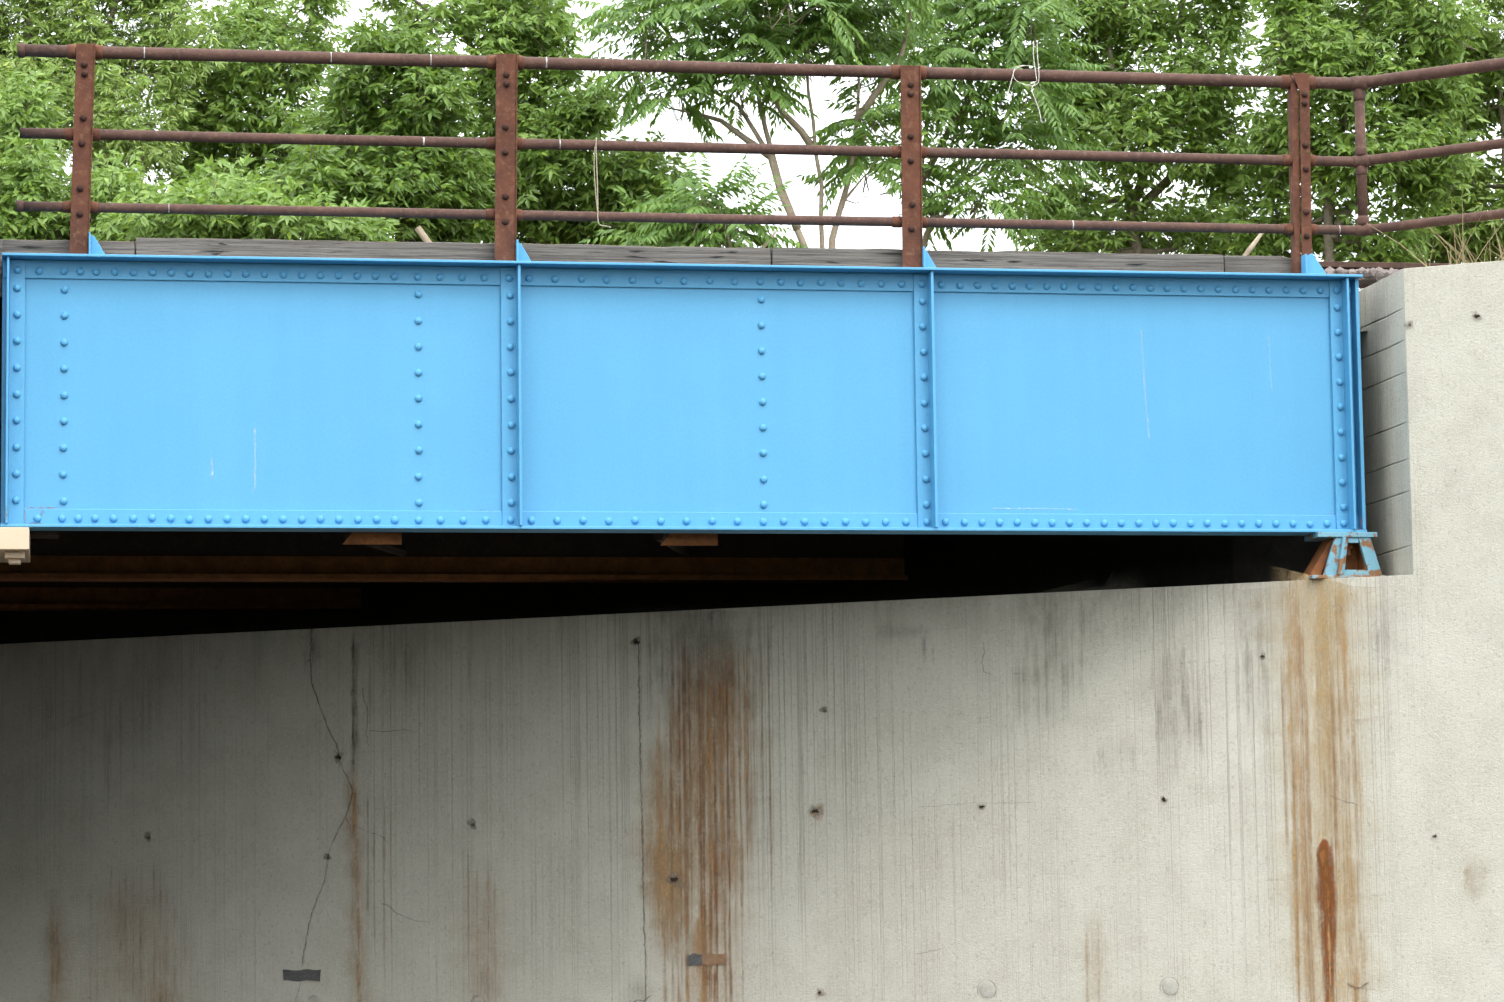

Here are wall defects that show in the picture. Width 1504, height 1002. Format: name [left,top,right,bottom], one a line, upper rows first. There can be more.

corrosion [647,659,754,1002]
corrosion [1282,574,1358,1002]